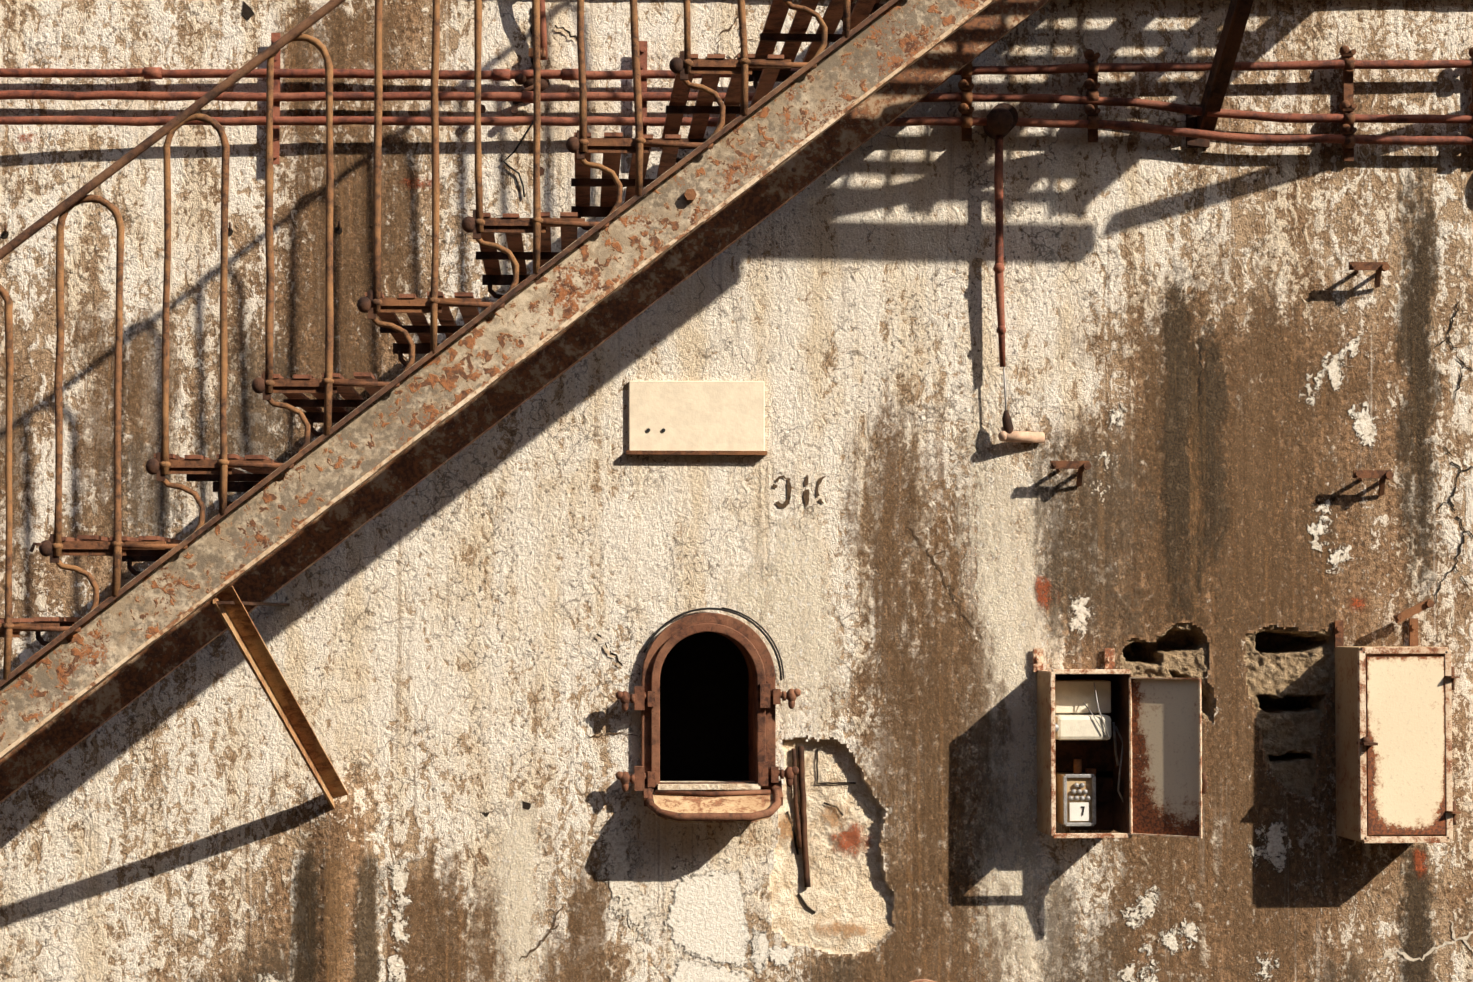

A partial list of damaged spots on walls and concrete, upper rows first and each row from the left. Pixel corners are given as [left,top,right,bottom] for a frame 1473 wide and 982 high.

water stain [1395,150,1442,599]
crack [1435,301,1473,404]
rust [1036,577,1060,609]
water stain [719,277,1473,982]
spalling [1120,623,1216,724]
spalling [1244,625,1335,801]
crack [1432,446,1473,608]
spalling [595,735,895,982]